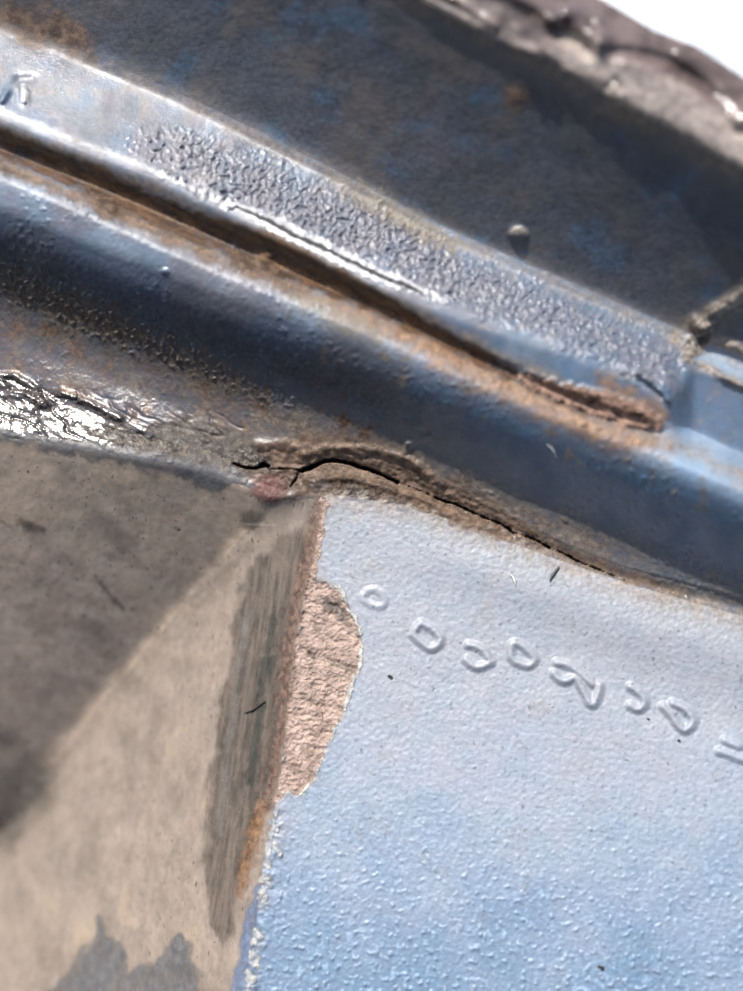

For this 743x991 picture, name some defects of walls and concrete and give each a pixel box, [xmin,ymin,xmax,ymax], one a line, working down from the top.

corrosion [0,4,93,57]
corrosion [0,129,656,448]
crack [233,458,625,581]
peeling [244,497,363,991]